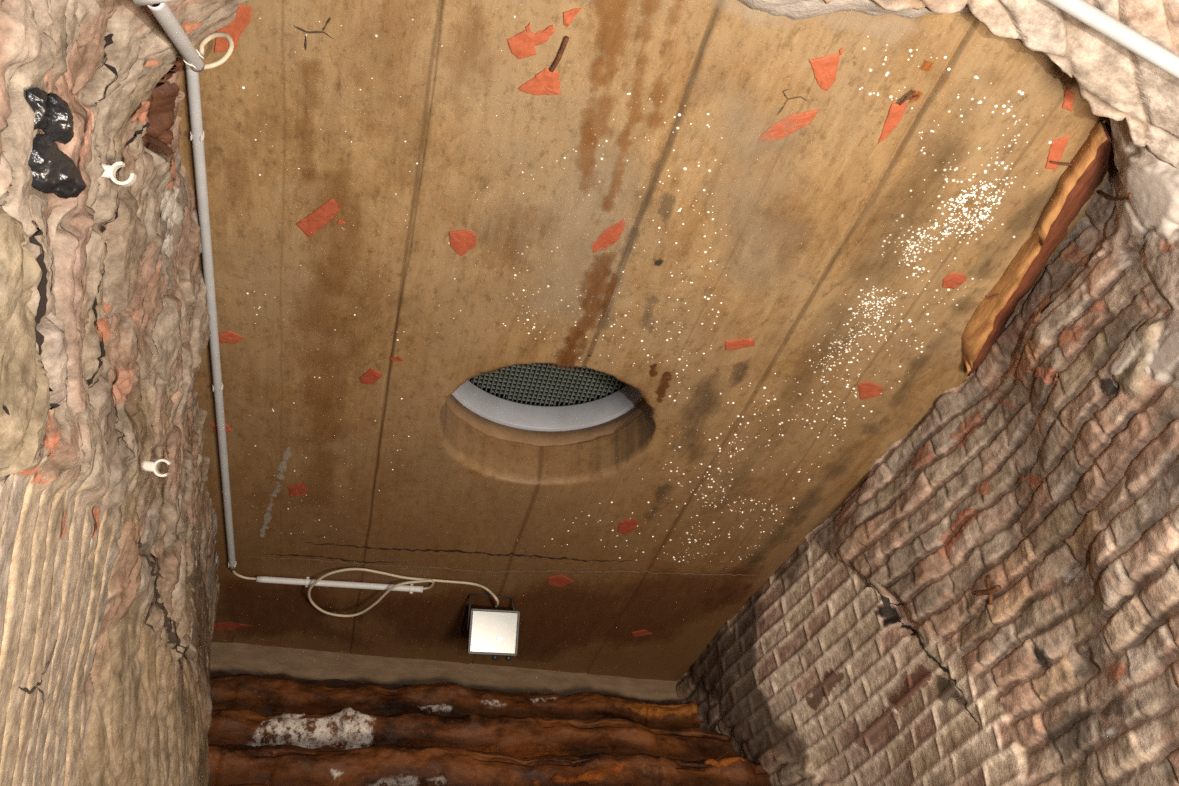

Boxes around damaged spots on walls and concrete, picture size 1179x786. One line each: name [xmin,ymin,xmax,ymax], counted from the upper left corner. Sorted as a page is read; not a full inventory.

spalling [507,8,581,59]
spalling [518,68,561,95]
spalling [810,48,843,91]
spalling [757,109,819,143]
spalling [878,102,908,143]
spalling [296,198,346,238]
spalling [449,229,477,256]
spalling [591,218,626,253]
rust [558,257,618,366]
crack [138,534,190,676]
crack [859,542,980,731]